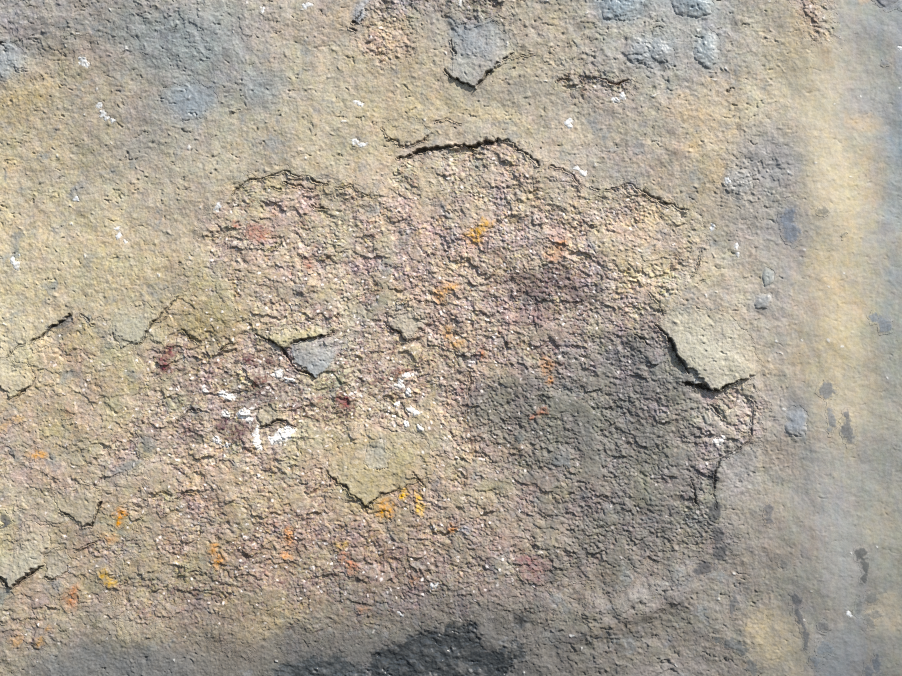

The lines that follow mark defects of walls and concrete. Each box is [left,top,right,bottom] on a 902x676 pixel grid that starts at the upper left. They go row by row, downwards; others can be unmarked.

crack [443,38,537,89]
crack [380,116,689,212]
corrosion [461,215,497,249]
leakage [777,204,804,248]
crack [6,313,95,357]
crack [138,295,335,379]
spalling [0,115,772,676]
crack [632,292,758,510]
leakage [815,378,858,449]
corrosion [372,486,427,522]
leakage [852,544,884,631]
leakage [789,589,835,672]